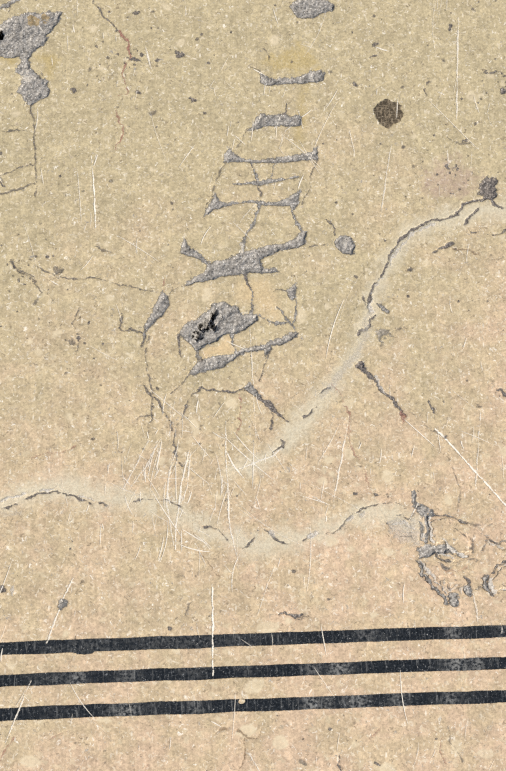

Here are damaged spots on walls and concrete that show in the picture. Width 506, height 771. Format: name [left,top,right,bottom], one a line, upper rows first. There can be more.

spalling [289,0,338,19]
spalling [0,10,62,105]
spalling [247,103,302,131]
leakage [374,99,403,128]
spalling [223,147,318,185]
spalling [119,281,170,344]
spalling [177,189,356,375]
crack [258,283,297,333]
crack [357,176,506,336]
crack [355,361,407,420]
crack [0,489,107,509]
crack [246,482,390,548]